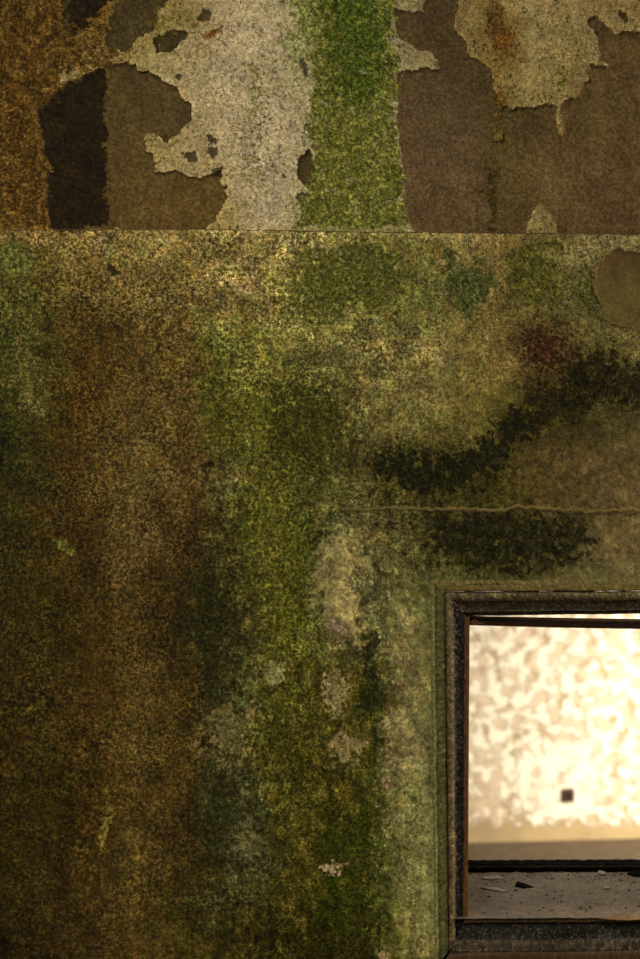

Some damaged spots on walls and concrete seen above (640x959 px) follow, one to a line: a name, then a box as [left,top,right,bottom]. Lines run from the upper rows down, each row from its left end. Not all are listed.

flaking render [35,0,231,230]
flaking render [282,149,316,202]
flaking render [395,0,640,235]
water stain [30,301,56,360]
water stain [480,238,507,342]
crack [339,504,640,515]
water stain [362,334,640,581]
water stain [182,554,257,727]
water stain [346,595,396,751]
water stain [178,757,276,896]
water stain [303,793,391,954]